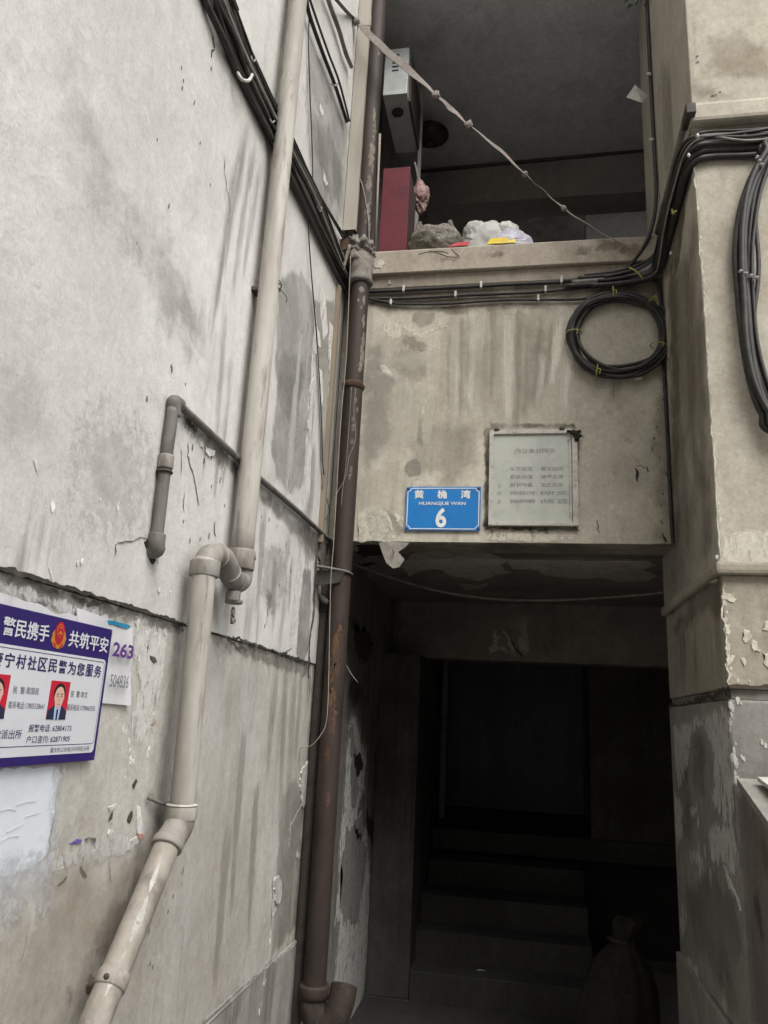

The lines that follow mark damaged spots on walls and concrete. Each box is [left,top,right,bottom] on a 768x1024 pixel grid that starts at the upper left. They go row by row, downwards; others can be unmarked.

damp [272,277,314,489]
damp [503,323,513,420]
damp [539,315,573,410]
crack [181,446,199,509]
flaking render [356,505,658,591]
damp [297,570,311,658]
flaking render [708,579,768,685]
rust [324,625,342,764]
flaking render [52,803,143,887]
damp [278,800,303,946]
flaking render [334,711,377,1019]